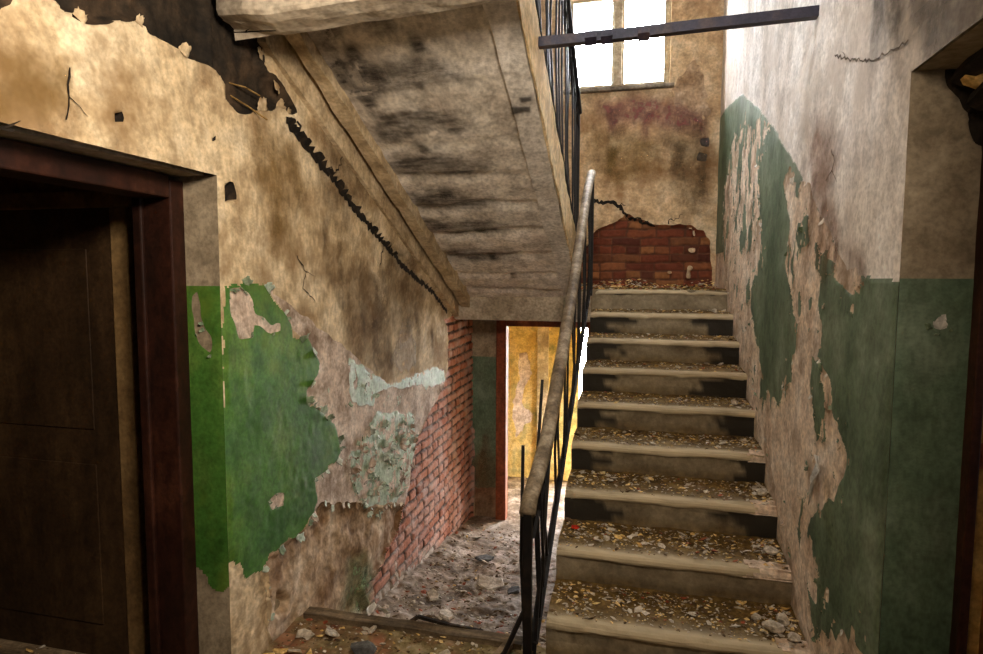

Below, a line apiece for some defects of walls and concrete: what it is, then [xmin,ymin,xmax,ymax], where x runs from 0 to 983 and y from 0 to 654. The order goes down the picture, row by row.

flaking render [55,0,297,115]
crack [835,40,908,63]
damp [336,47,443,107]
damp [380,112,460,140]
damp [396,146,474,174]
crack [286,117,447,314]
damp [415,192,482,208]
damp [426,220,498,233]
crack [594,198,682,227]
peeling [581,112,866,654]
flaking render [230,276,475,654]